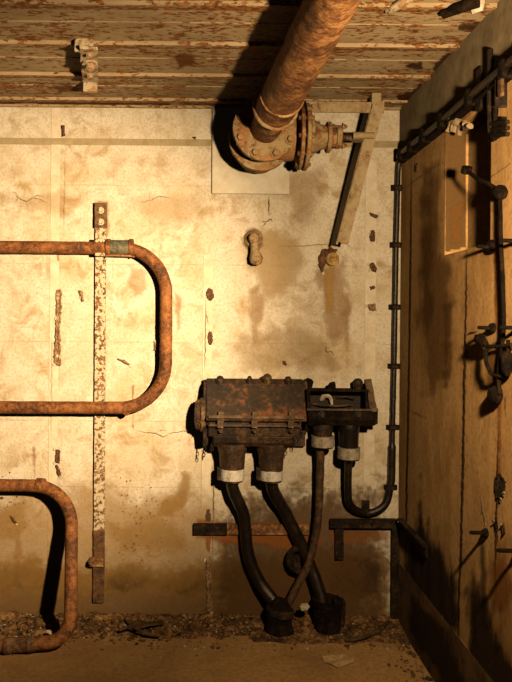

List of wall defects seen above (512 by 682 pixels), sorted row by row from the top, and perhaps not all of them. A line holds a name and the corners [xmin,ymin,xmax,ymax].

corrosion [175,53,196,68]
corrosion [396,84,422,100]
spalling [494,473,507,501]
water stain [77,471,251,616]
water stain [0,558,65,614]
water stain [351,546,391,616]
water stain [406,502,512,682]